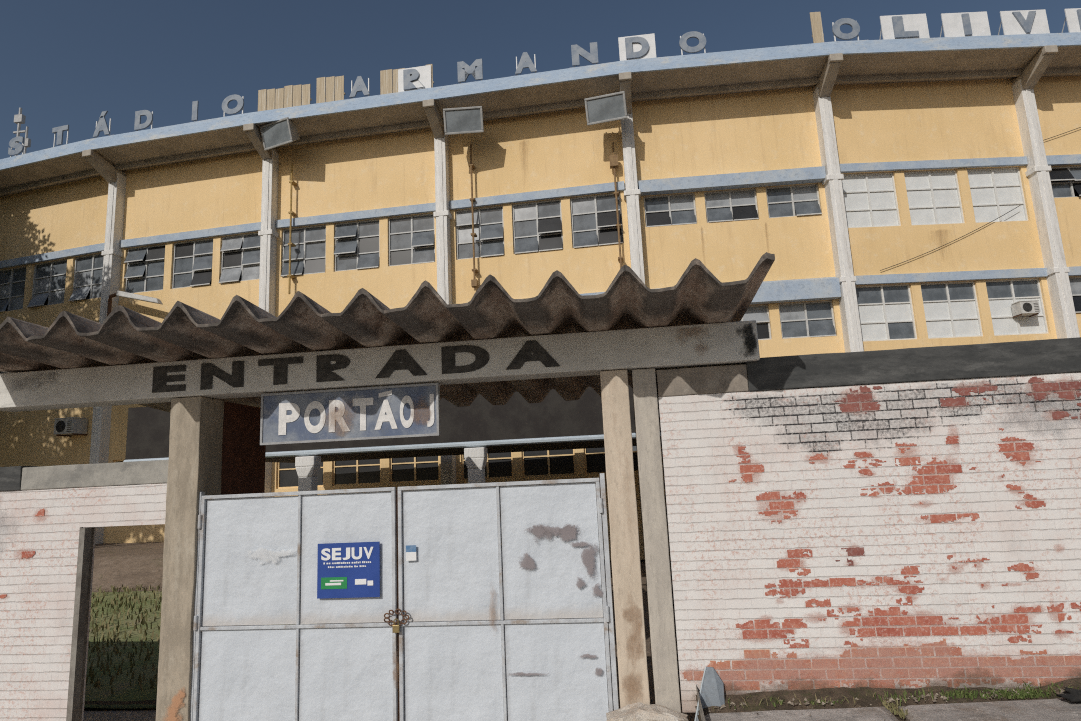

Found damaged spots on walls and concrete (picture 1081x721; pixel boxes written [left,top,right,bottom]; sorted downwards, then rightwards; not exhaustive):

peeling [835,385,882,414]
peeling [940,383,998,407]
peeling [1026,376,1081,420]
peeling [729,446,764,483]
peeling [756,491,806,524]
peeling [842,442,980,523]
peeling [945,429,959,444]
peeling [998,428,1041,465]
peeling [999,474,1046,509]
peeling [519,553,536,570]
peeling [527,524,603,596]
peeling [682,546,1081,691]